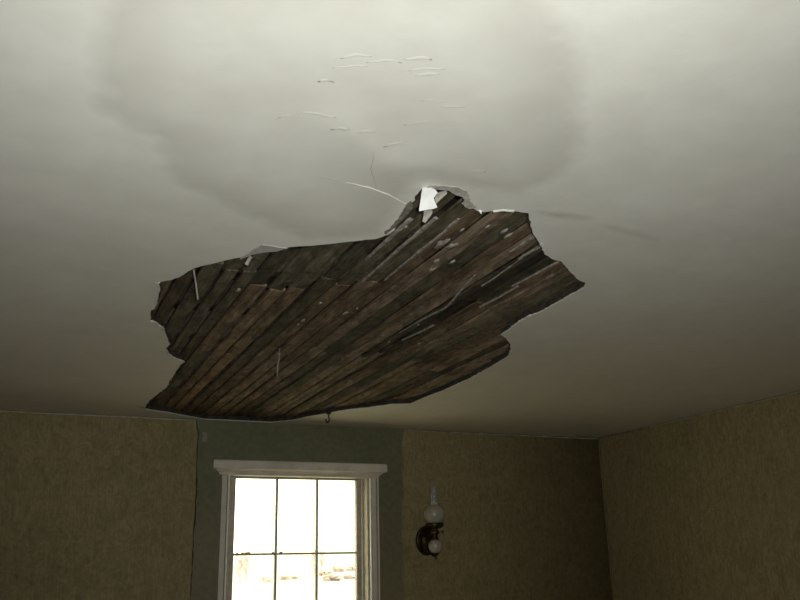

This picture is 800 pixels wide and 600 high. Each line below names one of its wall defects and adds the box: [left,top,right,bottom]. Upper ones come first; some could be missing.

crack [322,155,406,204]
flaking render [240,244,287,266]
spalling [361,185,482,283]
spalling [480,213,570,308]
spalling [145,274,585,422]